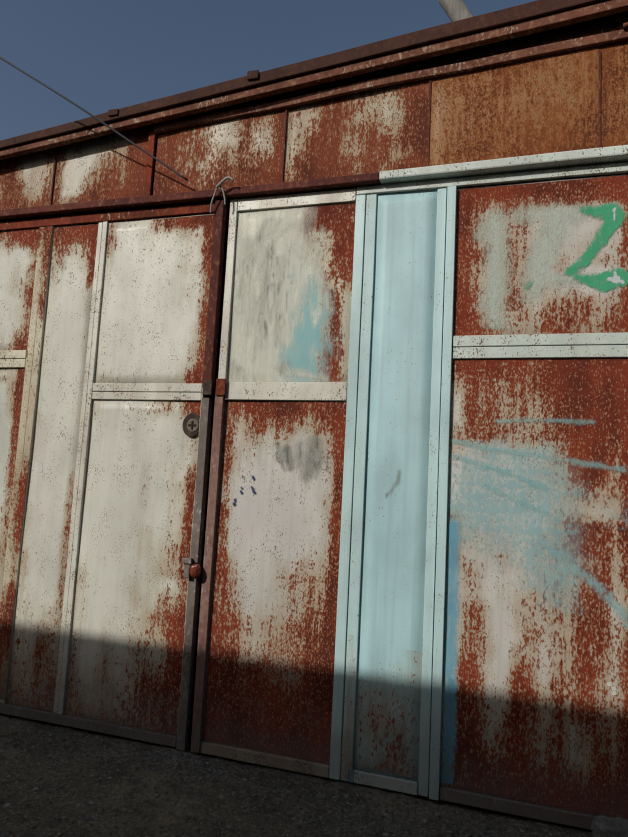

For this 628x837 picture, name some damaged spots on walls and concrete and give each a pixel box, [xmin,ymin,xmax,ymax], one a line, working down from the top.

rust [0,40,628,210]
rust [107,223,119,264]
rust [150,214,214,383]
rust [299,203,356,382]
rust [0,224,99,711]
rust [145,401,201,419]
rust [65,434,199,735]
rust [203,401,347,764]
rust [440,358,628,820]
rust [357,665,419,778]